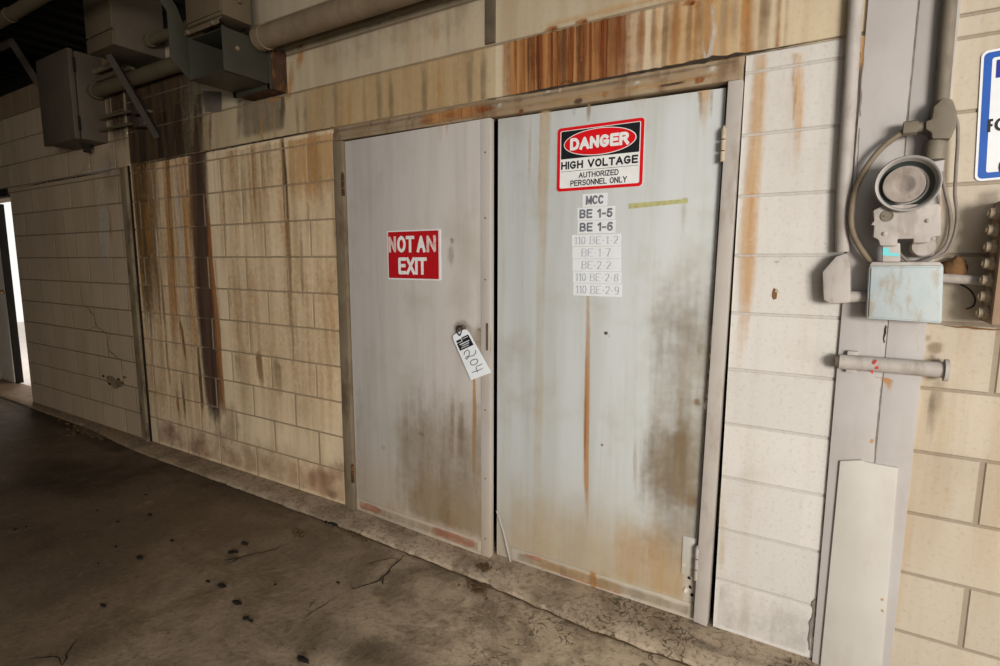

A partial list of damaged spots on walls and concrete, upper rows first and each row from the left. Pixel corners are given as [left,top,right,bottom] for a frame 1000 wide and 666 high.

rust [507,16,626,95]
rust [131,157,175,317]
rust [185,153,224,419]
rust [281,142,291,270]
rust [745,139,756,284]
spalling [102,375,126,389]
crack [3,398,691,666]